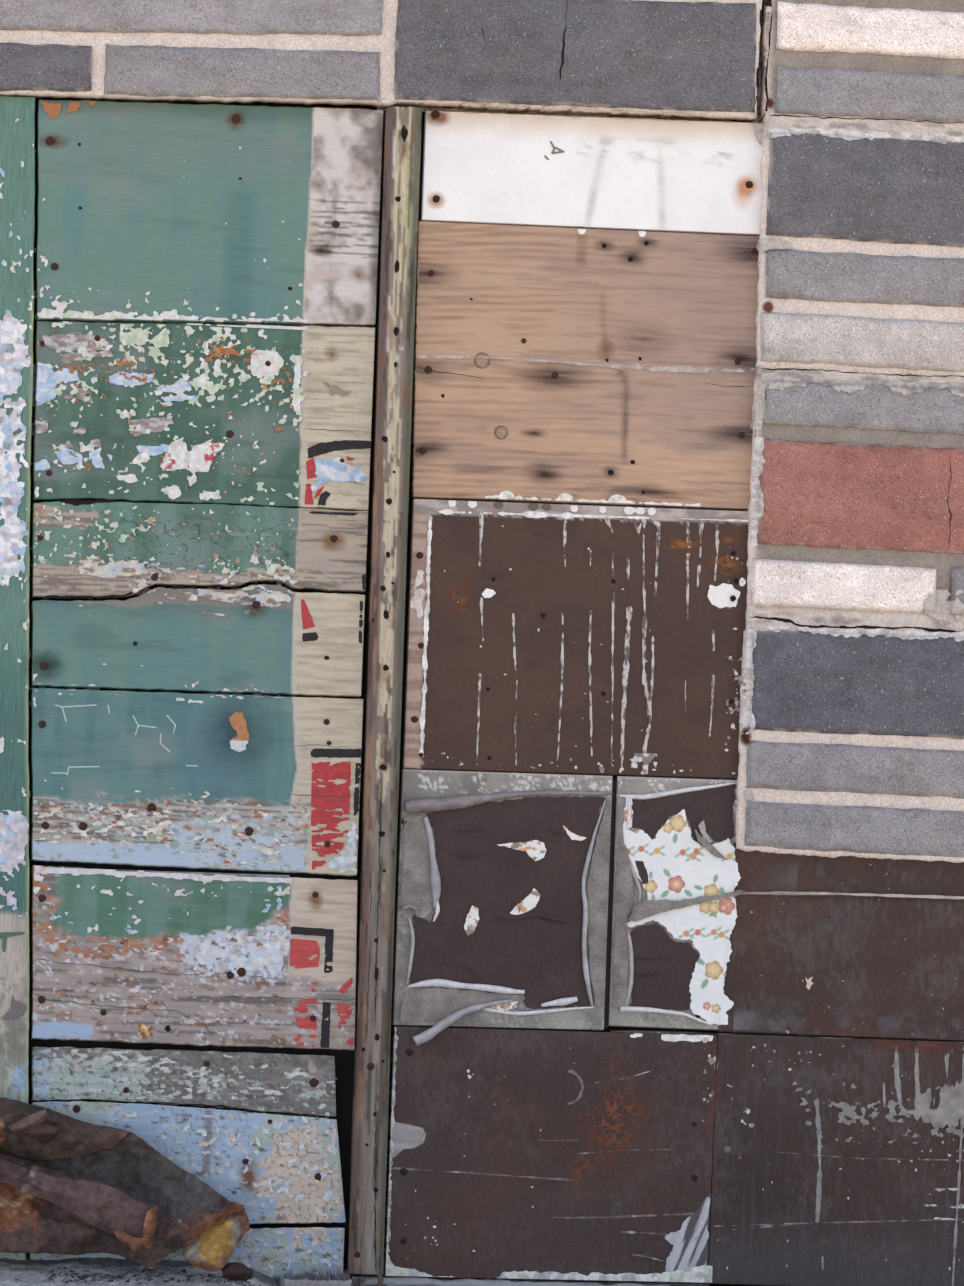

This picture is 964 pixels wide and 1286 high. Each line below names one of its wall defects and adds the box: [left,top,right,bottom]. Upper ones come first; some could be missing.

crack [559,12,567,82]
crack [751,0,962,123]
peeling [0,211,367,634]
spalling [417,355,964,546]
crack [29,583,231,601]
peeling [409,509,649,757]
peeling [708,555,746,612]
spalling [725,590,964,751]
peeling [328,822,358,873]
peeling [0,780,344,1278]
corrosion [577,1091,640,1178]
peeling [751,1031,964,1171]